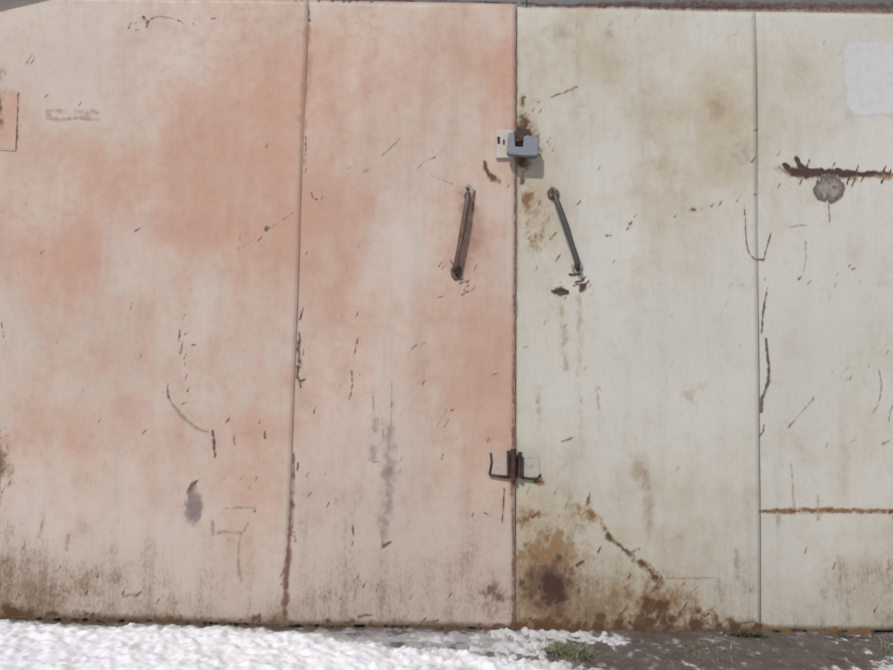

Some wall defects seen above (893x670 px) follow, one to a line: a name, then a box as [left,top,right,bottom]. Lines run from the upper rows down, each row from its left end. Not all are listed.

corrosion [515,47,553,152]
corrosion [777,155,893,187]
corrosion [483,157,541,447]
corrosion [0,453,309,627]
corrosion [324,614,383,629]
corrosion [565,492,596,527]
corrosion [394,508,791,634]
corrosion [808,626,871,634]